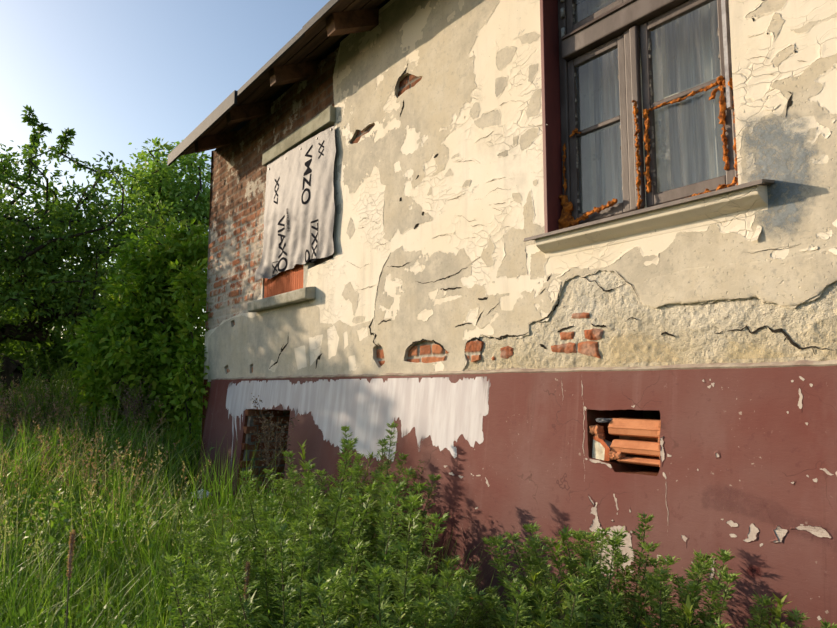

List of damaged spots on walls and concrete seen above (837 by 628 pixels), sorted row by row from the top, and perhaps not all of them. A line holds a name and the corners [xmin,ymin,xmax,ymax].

crack [748,0,793,118]
spalling [206,0,837,382]
water stain [745,119,815,231]
crack [347,131,606,358]
crack [582,271,640,322]
crack [269,342,288,369]
crack [715,325,830,354]
peeling [587,493,635,576]
peeling [721,519,833,547]